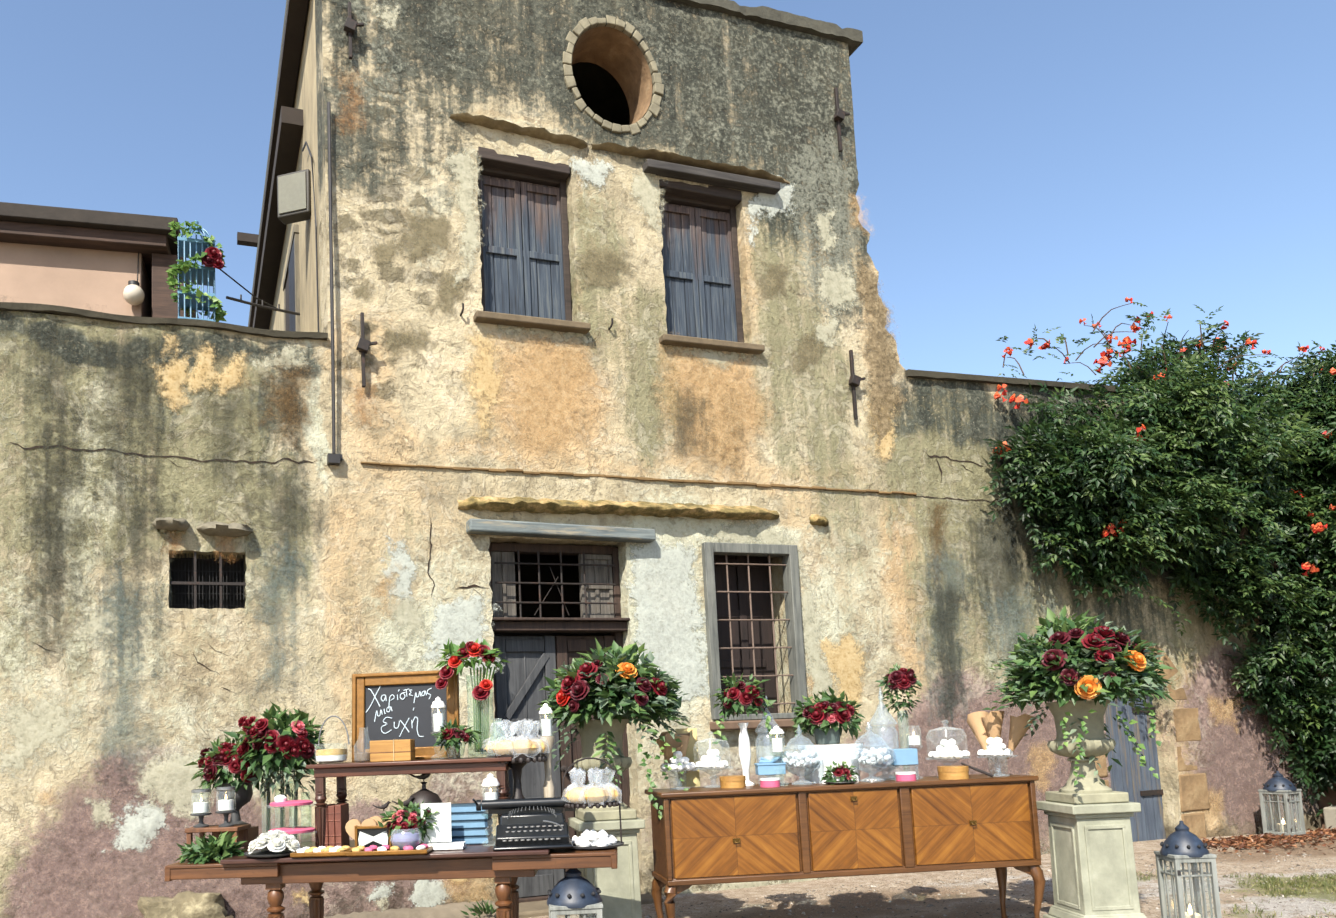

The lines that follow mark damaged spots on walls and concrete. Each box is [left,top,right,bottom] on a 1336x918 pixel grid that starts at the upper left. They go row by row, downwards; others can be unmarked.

flaking render [631,172,664,232]
flaking render [747,175,795,246]
flaking render [795,211,907,460]
leakage [37,427,82,586]
leakage [97,344,156,492]
leakage [116,501,152,650]
crack [10,442,317,468]
leakage [931,506,963,714]
crack [914,451,1007,504]
leakage [971,506,1027,622]
flaking render [17,751,314,918]